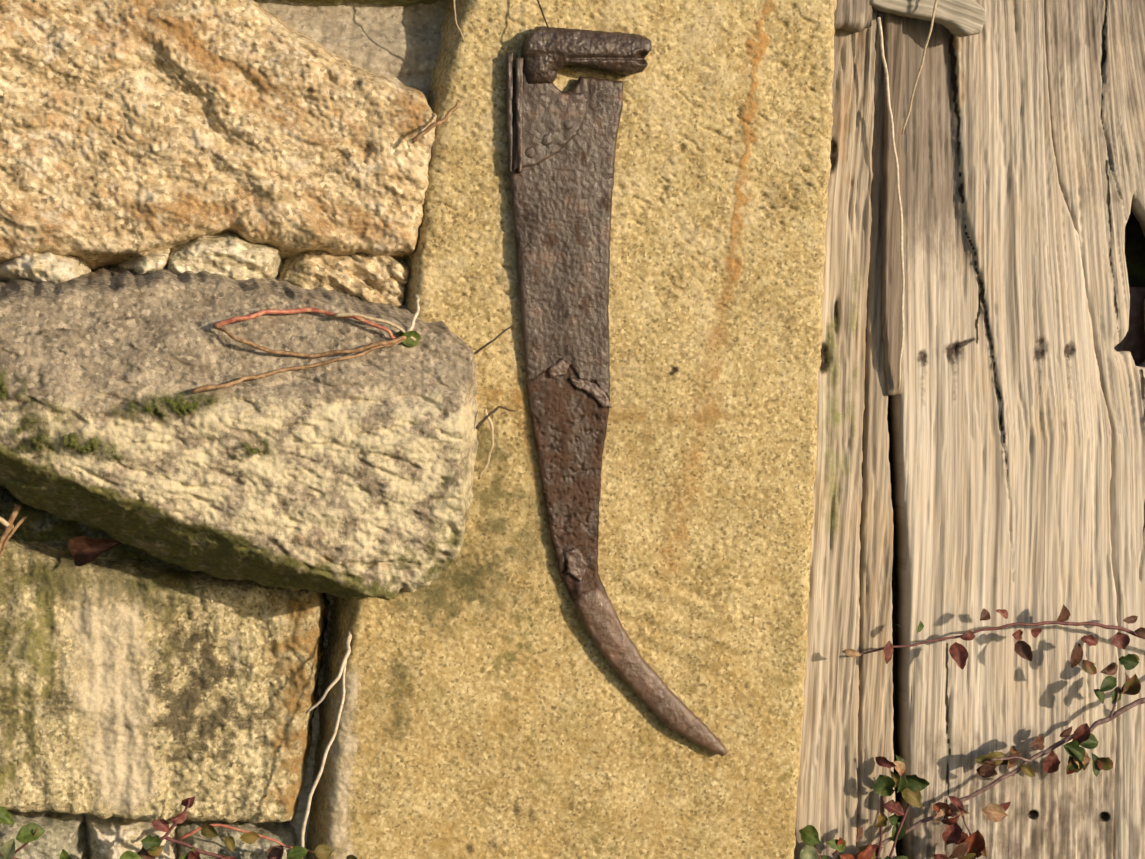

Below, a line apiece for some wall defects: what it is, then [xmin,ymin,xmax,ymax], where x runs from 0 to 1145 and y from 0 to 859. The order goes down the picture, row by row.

corrosion [723,0,775,283]
leakage [0,560,164,810]
leakage [229,636,240,669]